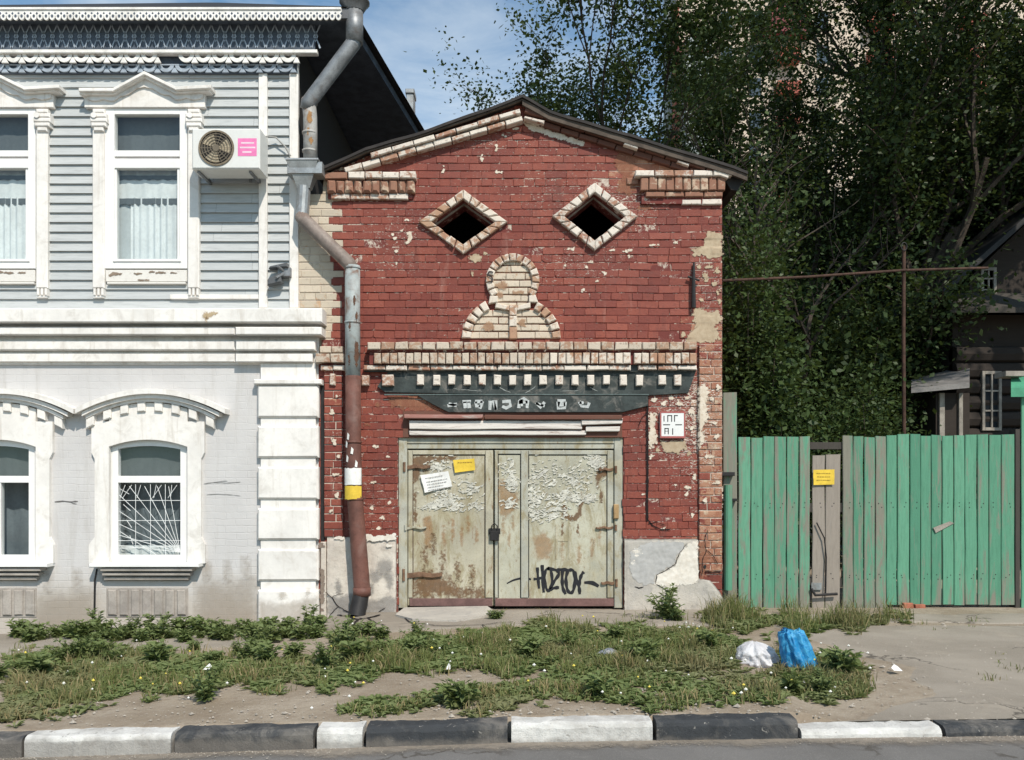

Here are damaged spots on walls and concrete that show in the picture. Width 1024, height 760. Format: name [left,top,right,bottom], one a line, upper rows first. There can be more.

peeling [109,271,176,281]
peeling [681,231,724,343]
rust [561,502,584,535]
rust [413,533,484,598]
flaking render [654,539,720,590]